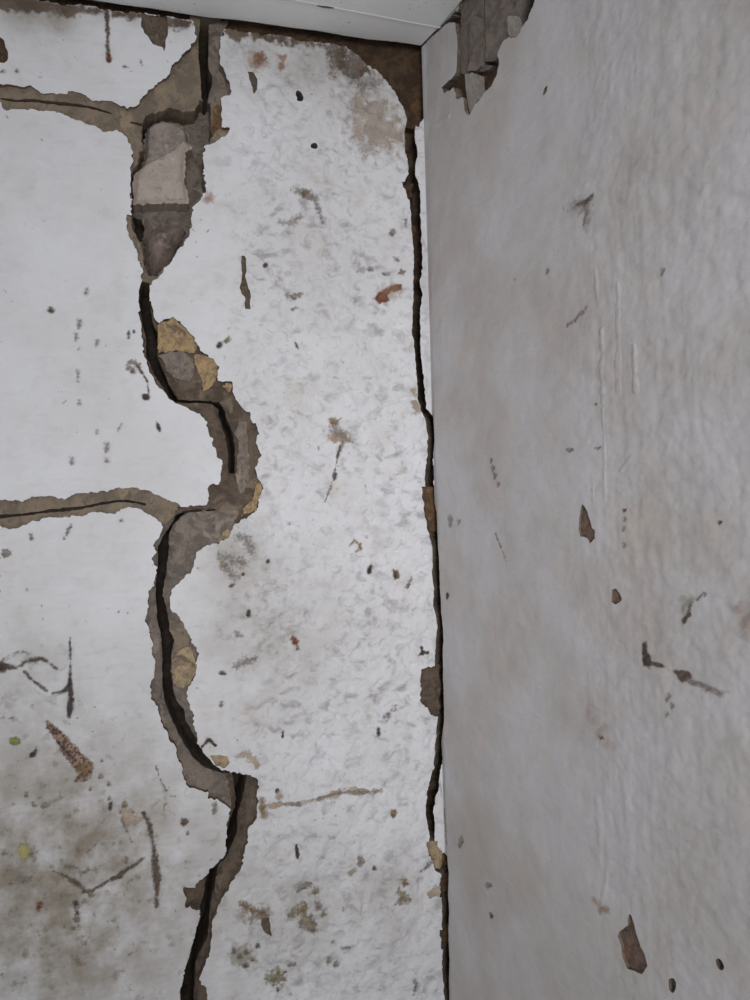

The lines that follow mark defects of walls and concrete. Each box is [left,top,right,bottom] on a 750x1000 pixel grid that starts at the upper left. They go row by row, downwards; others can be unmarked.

flaking render [332,37,424,134]
flaking render [449,0,535,113]
crack [403,133,434,424]
crack [141,297,231,474]
flaking render [0,12,263,1000]
crack [422,459,437,532]
peeling [581,506,595,542]
crack [156,509,217,749]
crack [420,661,444,715]
crack [426,739,449,892]
crack [181,869,210,997]
peeling [621,917,647,972]